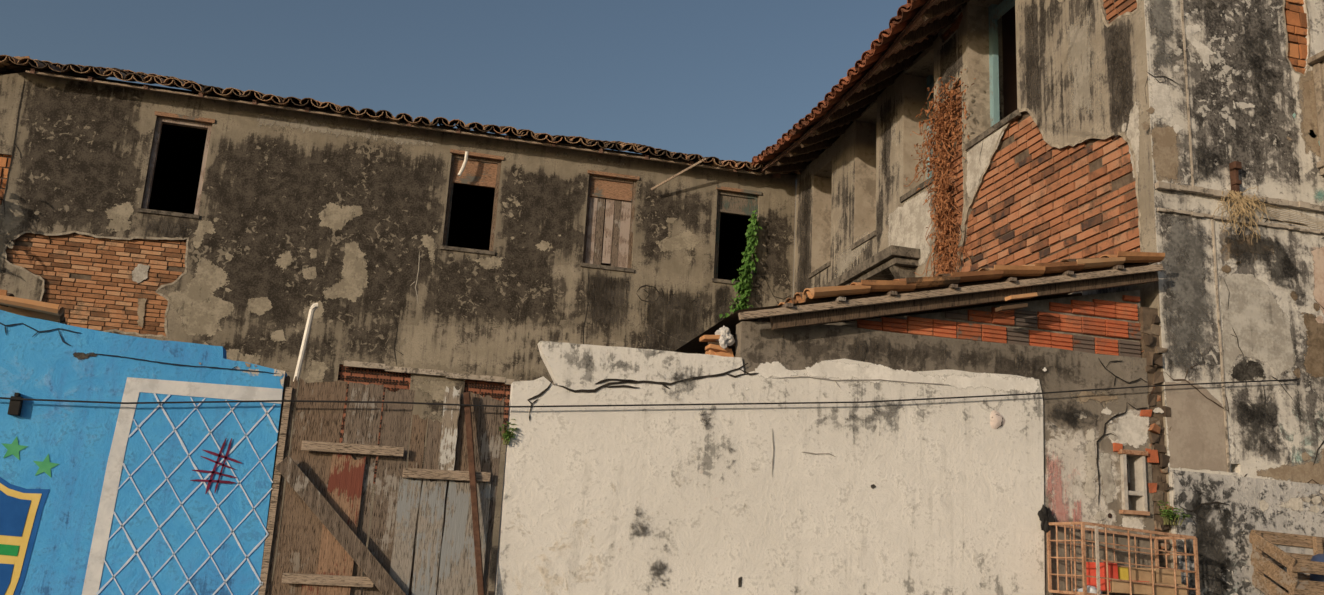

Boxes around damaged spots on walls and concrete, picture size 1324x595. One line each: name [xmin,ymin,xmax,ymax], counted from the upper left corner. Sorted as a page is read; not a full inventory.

damp [257,114,433,146]
flaking render [888,65,1183,277]
damp [1236,23,1281,125]
flaking render [1282,0,1321,157]
flaking render [0,188,273,345]
peeling [270,202,379,342]
damp [586,273,728,352]
damp [1163,218,1215,368]
damp [1225,234,1304,297]
peeling [1220,233,1324,398]
damp [1188,493,1230,595]
peeling [1256,450,1324,513]